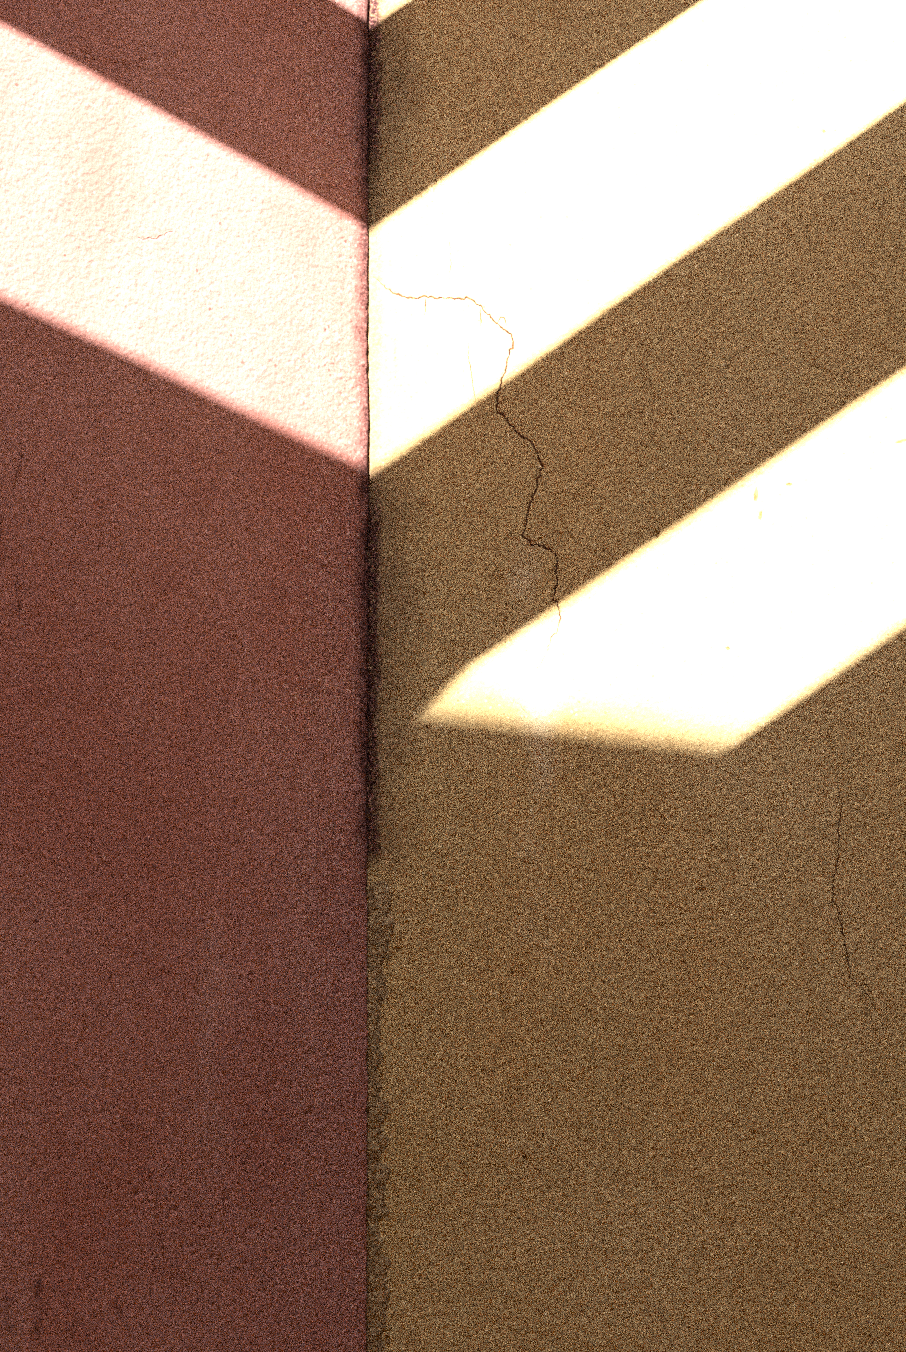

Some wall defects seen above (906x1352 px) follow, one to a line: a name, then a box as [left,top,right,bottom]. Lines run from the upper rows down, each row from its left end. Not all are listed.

crack [374,277,561,677]